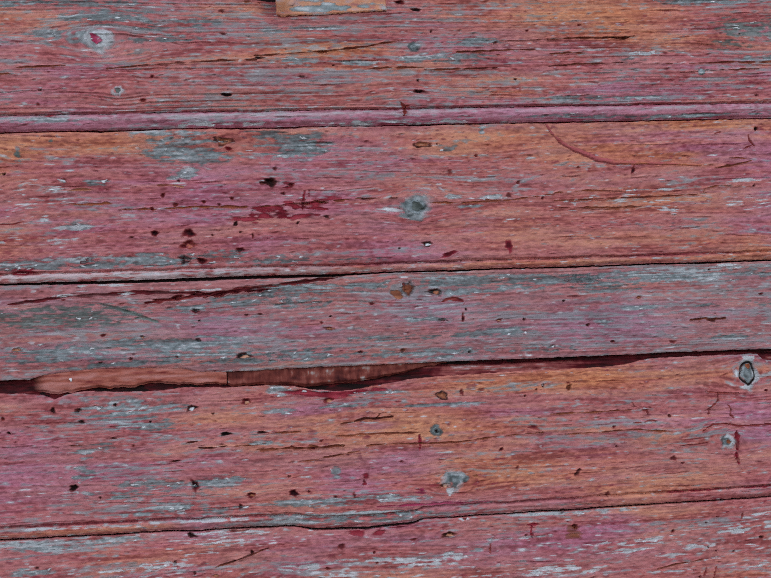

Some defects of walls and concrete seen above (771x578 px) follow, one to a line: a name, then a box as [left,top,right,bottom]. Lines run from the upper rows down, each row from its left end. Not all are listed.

peeling [131,121,235,180]
peeling [244,122,332,158]
crack [429,134,755,210]
peeling [0,294,128,330]
peeling [167,281,389,313]
peeling [0,335,477,370]
peeling [508,507,636,516]
peeling [718,512,771,533]
peeling [600,537,662,553]
peeling [99,559,192,578]
peeling [281,551,465,577]
peeling [526,565,598,576]